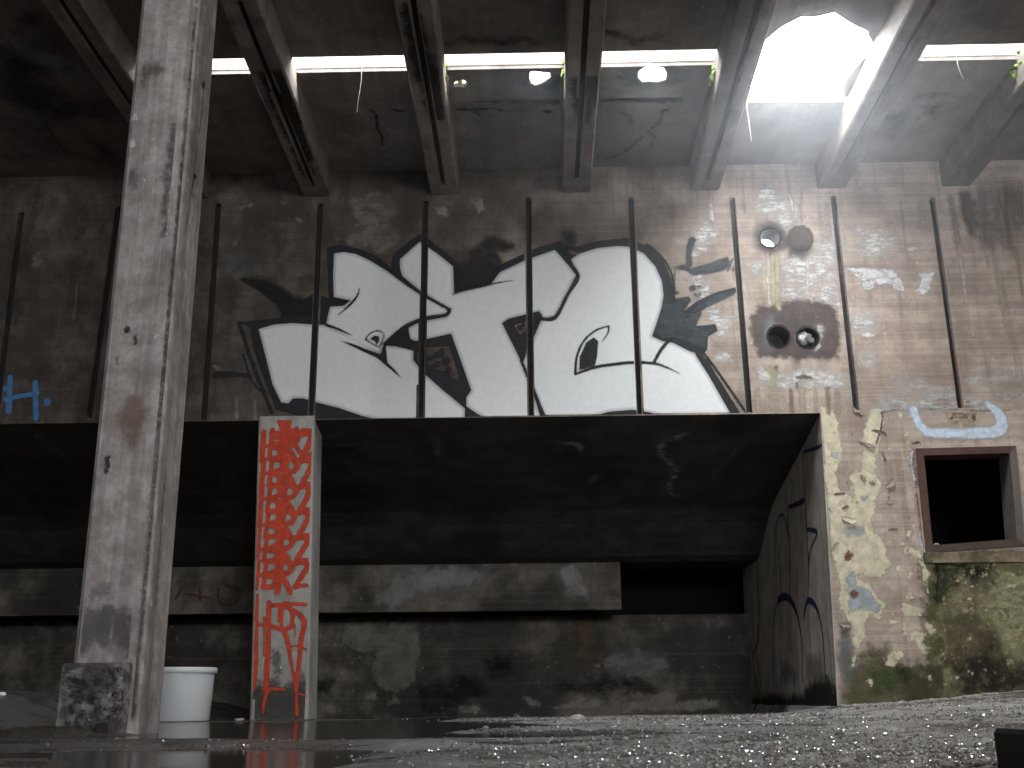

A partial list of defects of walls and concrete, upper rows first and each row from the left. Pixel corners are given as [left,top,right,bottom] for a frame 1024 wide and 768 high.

peeling [848,268,934,295]
damp [946,187,1024,356]
peeling [819,405,1023,689]